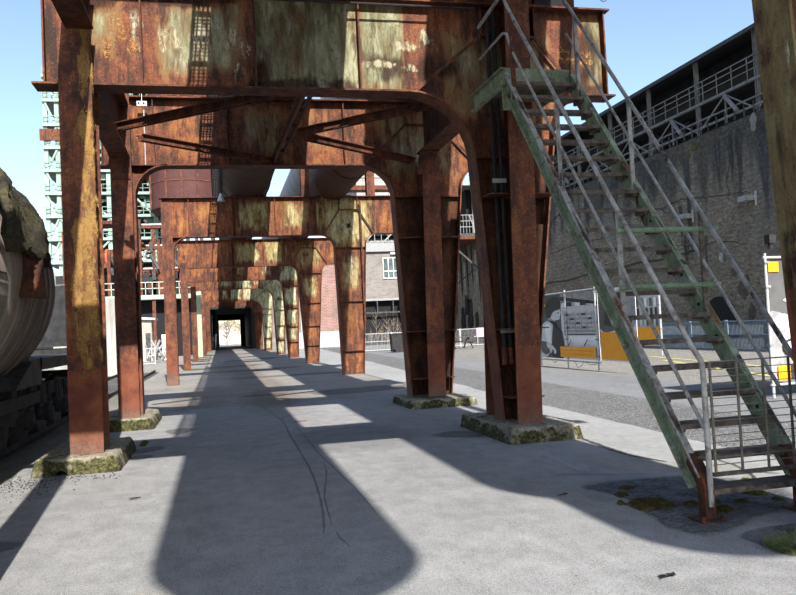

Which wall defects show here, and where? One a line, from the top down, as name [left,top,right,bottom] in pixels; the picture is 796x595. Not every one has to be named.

corrosion [371,57,403,80]
corrosion [757,390,785,433]